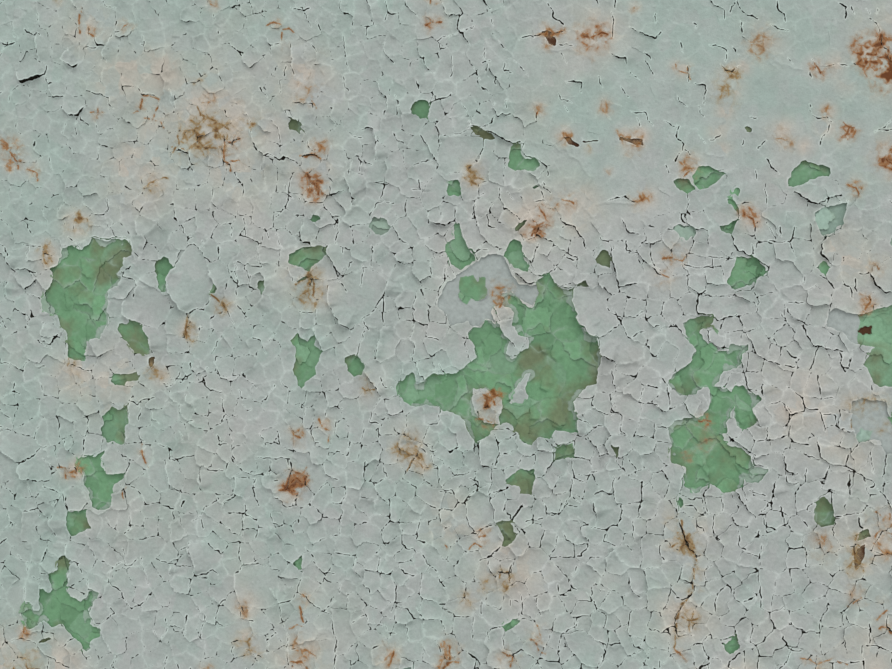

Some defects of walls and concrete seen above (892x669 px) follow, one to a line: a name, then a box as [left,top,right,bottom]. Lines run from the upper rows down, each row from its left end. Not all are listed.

crack [19,66,47,83]
rust [850,33,892,91]
rust [172,106,240,172]
rust [878,148,892,171]
peeling [269,112,892,570]
crack [682,264,780,365]
peeling [0,202,387,669]
rust [478,389,503,428]
rust [278,467,310,495]
crack [761,483,786,530]
crack [817,442,889,543]
peeling [420,542,455,581]